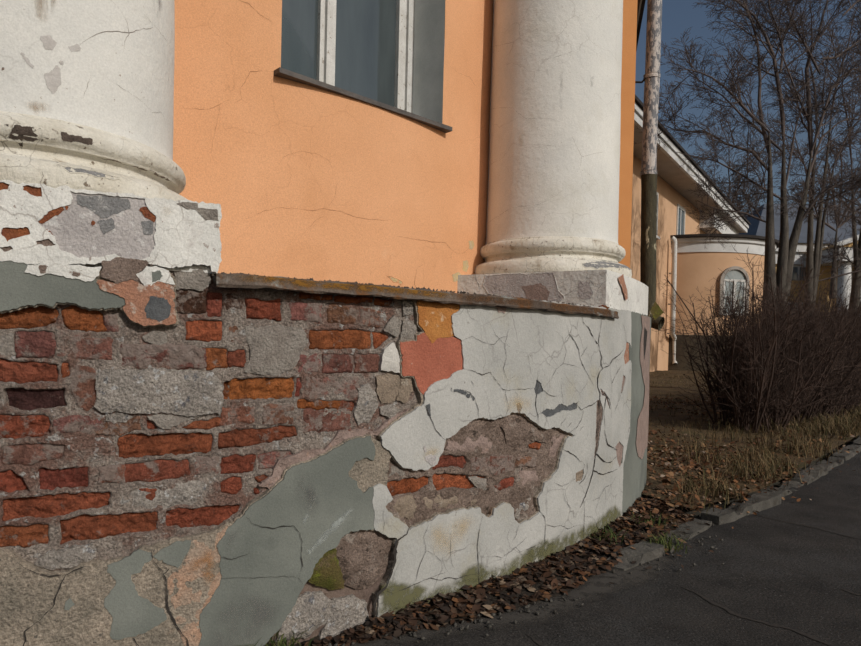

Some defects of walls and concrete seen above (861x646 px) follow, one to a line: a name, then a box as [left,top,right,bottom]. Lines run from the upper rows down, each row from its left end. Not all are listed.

peeling [5,124,93,147]
crack [97,157,170,181]
peeling [23,185,42,197]
peeling [483,272,565,314]
peeling [581,260,632,300]
flaking render [0,191,475,646]
peeling [542,403,577,417]
flaking render [386,403,570,527]
crack [374,278,633,620]